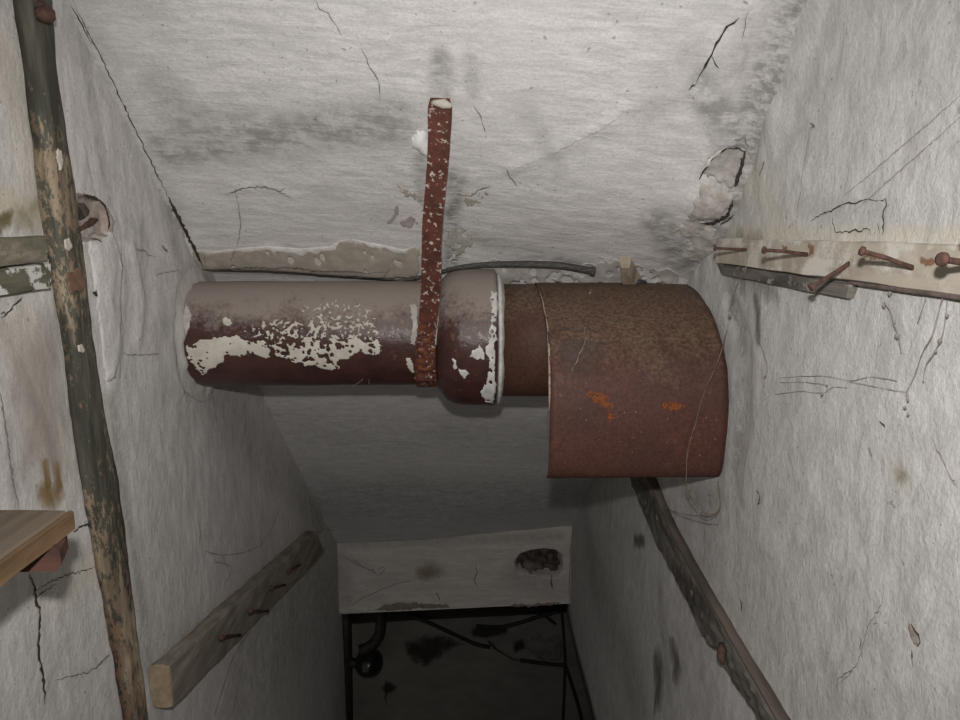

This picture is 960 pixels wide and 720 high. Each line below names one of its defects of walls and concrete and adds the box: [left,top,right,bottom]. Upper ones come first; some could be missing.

crack [689,13,748,90]
spalling [76,193,115,242]
crack [70,0,390,279]
peeling [192,239,420,279]
spalling [673,136,749,264]
crack [795,97,958,235]
spalling [515,548,560,587]
crack [30,568,109,702]